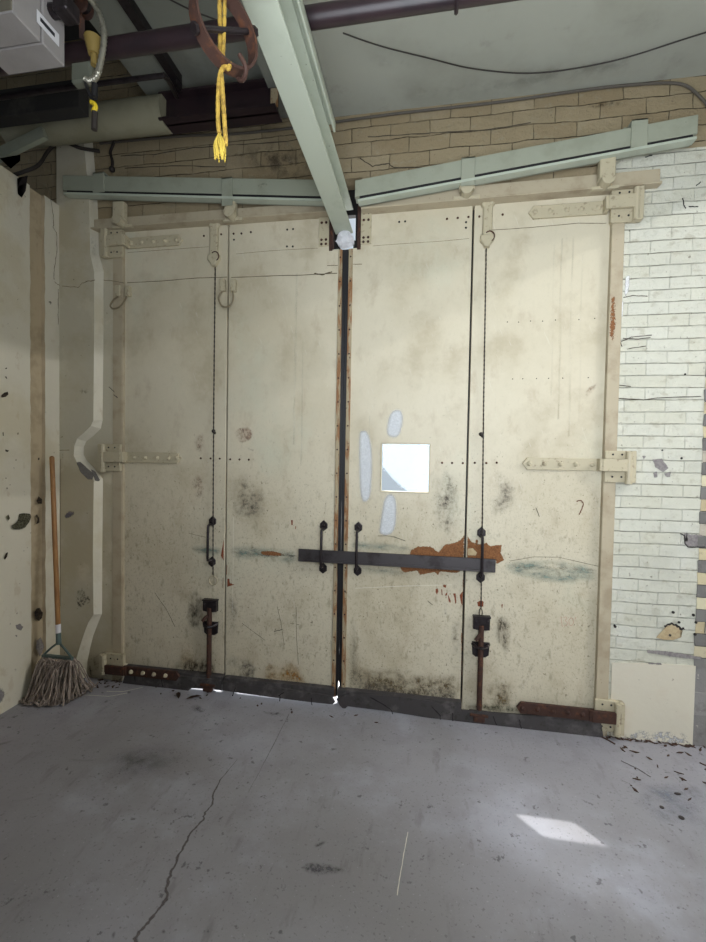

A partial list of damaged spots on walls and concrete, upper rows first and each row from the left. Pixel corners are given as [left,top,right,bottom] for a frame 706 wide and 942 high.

crack [133,761,236,942]